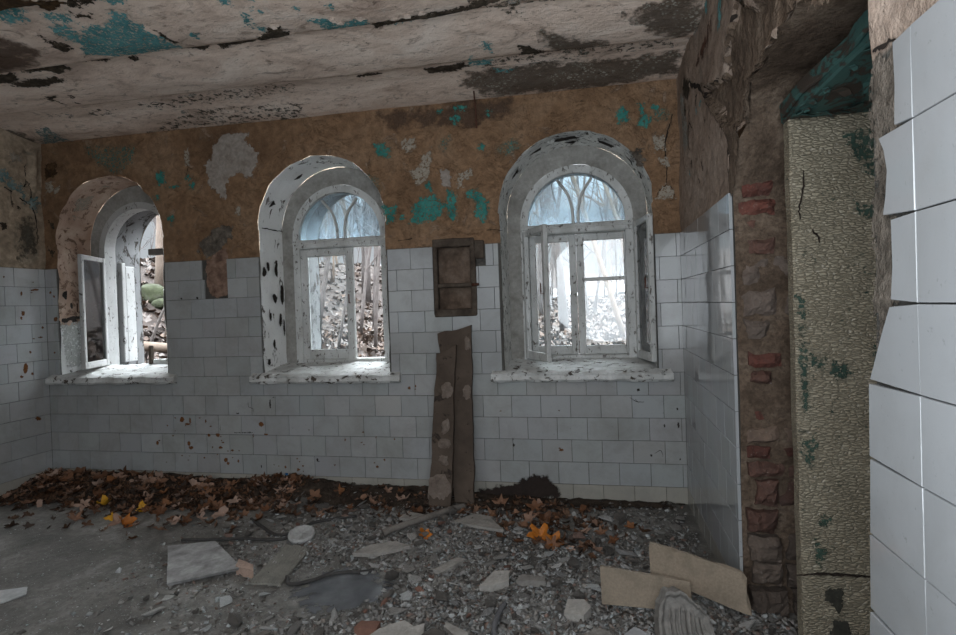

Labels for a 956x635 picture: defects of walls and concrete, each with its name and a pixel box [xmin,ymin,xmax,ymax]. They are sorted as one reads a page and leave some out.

water stain [0,38,40,73]
flaking render [0,65,81,144]
peeling [0,0,294,64]
flaking render [138,83,304,200]
flaking render [291,0,555,30]
water stain [376,29,683,129]
flaking render [423,39,674,73]
water stain [621,0,703,38]
flaking render [683,0,829,196]
peeling [373,136,489,227]
peeling [791,40,902,366]
crack [797,571,870,579]